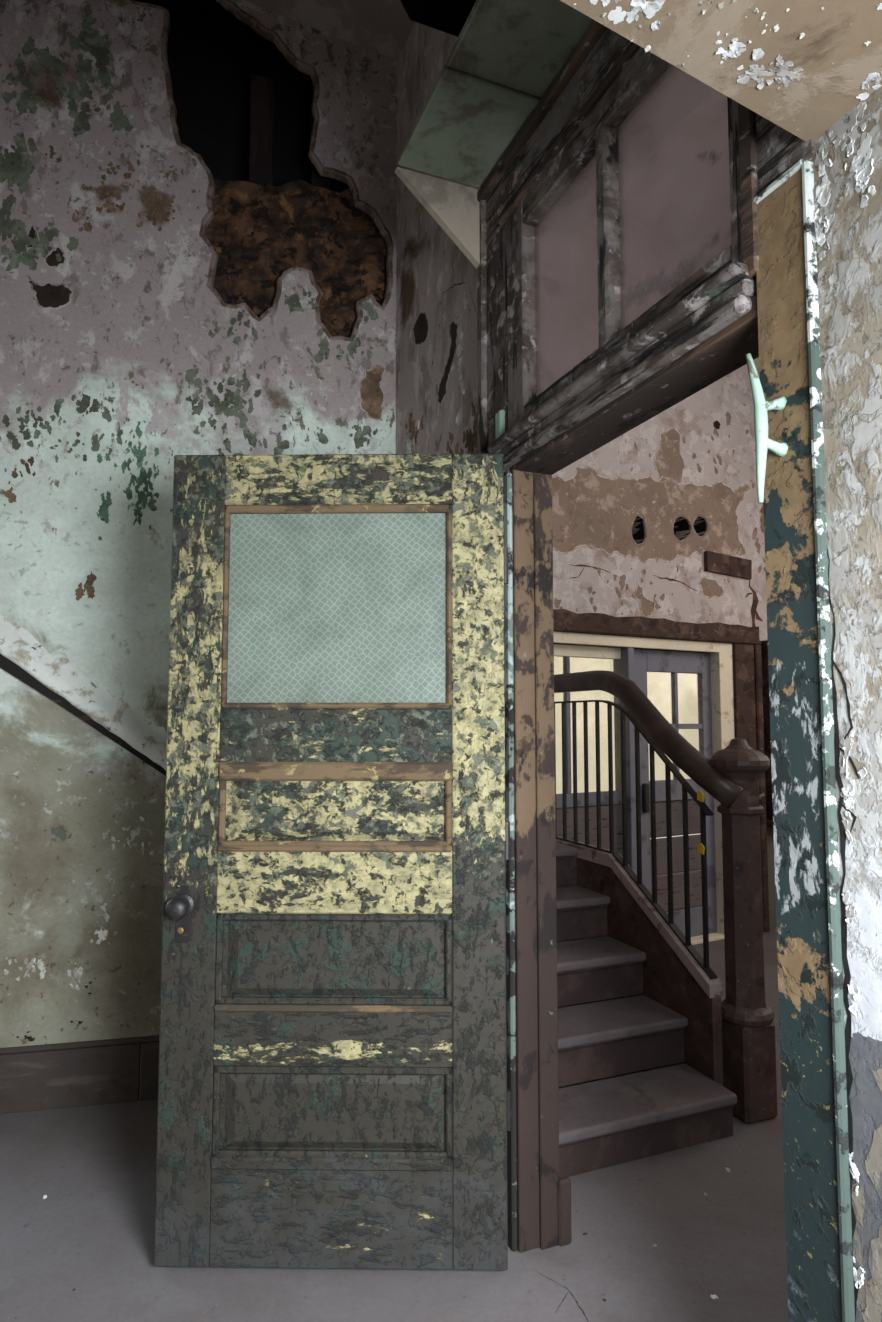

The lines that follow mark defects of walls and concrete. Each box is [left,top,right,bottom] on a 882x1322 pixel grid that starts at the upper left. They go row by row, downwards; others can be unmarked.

peeling [2,9,133,137]
peeling [574,0,670,52]
peeling [715,8,796,90]
peeling [0,132,175,310]
spalling [130,0,394,455]
flaking render [809,71,882,325]
peeling [2,394,159,530]
peeling [75,571,97,601]
flaking render [552,412,765,618]
flaking render [827,351,882,503]
flaking render [872,1068,882,1093]
flaking render [849,1125,882,1322]